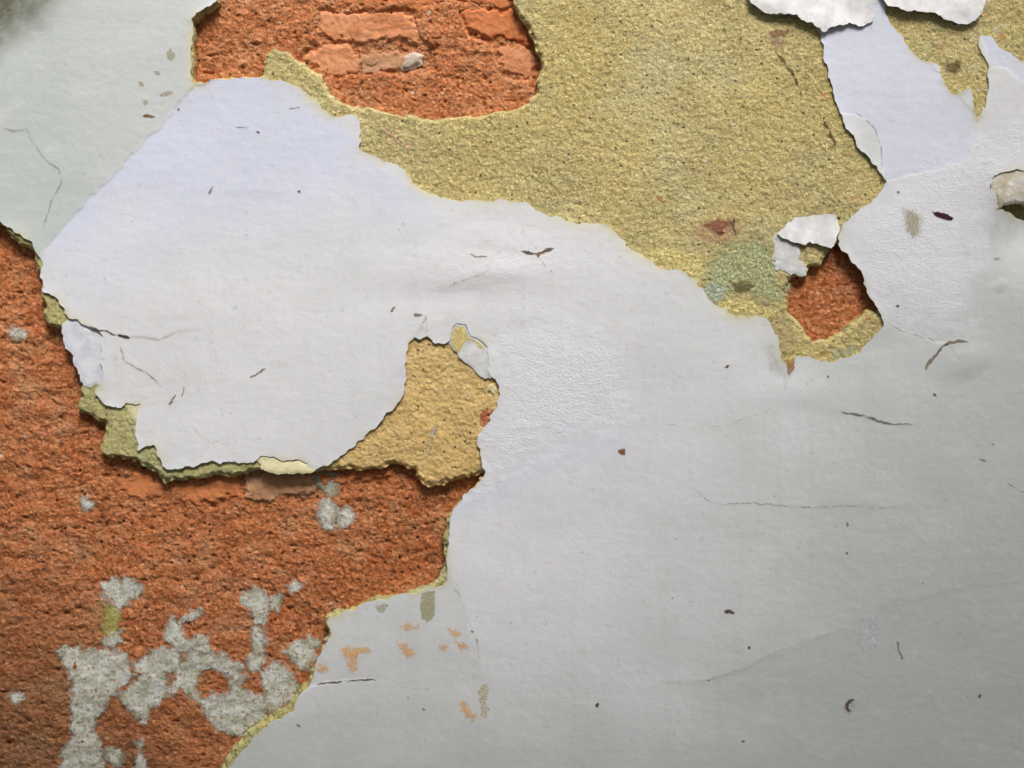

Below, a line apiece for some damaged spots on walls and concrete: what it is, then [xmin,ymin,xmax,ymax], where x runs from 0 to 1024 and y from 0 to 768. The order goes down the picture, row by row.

flaking render [191,0,1024,369]
spalling [0,222,500,768]
crack [843,412,909,425]
crack [316,678,376,686]